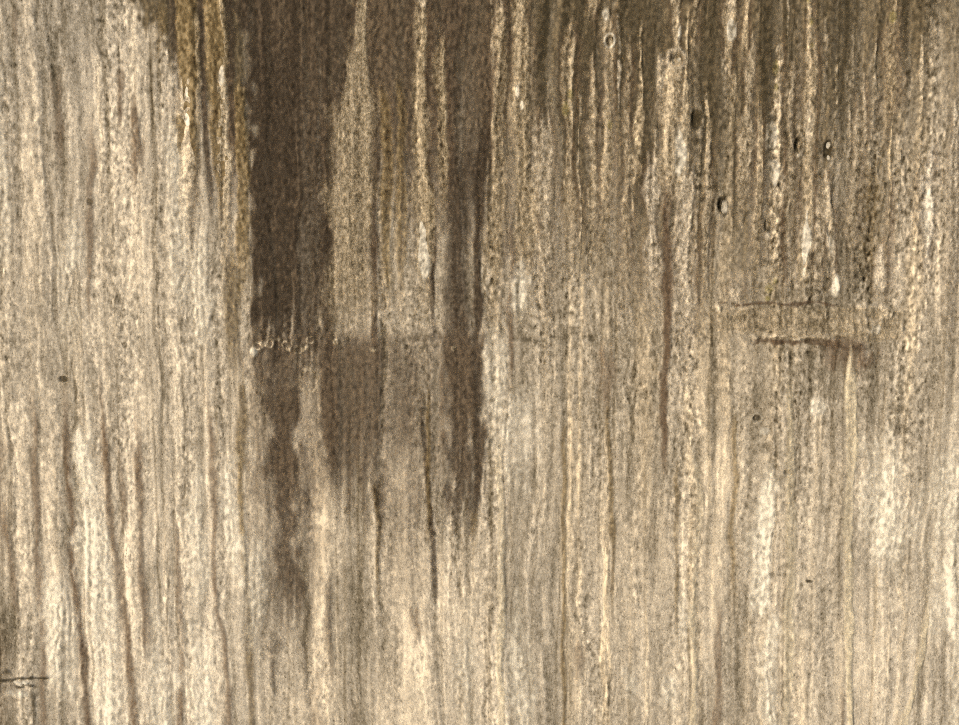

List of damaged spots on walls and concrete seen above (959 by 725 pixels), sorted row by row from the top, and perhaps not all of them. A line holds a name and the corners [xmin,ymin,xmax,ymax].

leakage [172,78,194,215]
leakage [193,243,208,334]
efflorescence [217,65,231,205]
leakage [235,0,552,606]
leakage [560,0,839,454]
leakage [848,84,865,229]
efflorescence [874,247,885,291]
efflorescence [920,154,933,262]
leakage [189,428,241,596]
leakage [751,485,774,612]
leakage [151,649,211,725]
leakage [221,627,231,725]